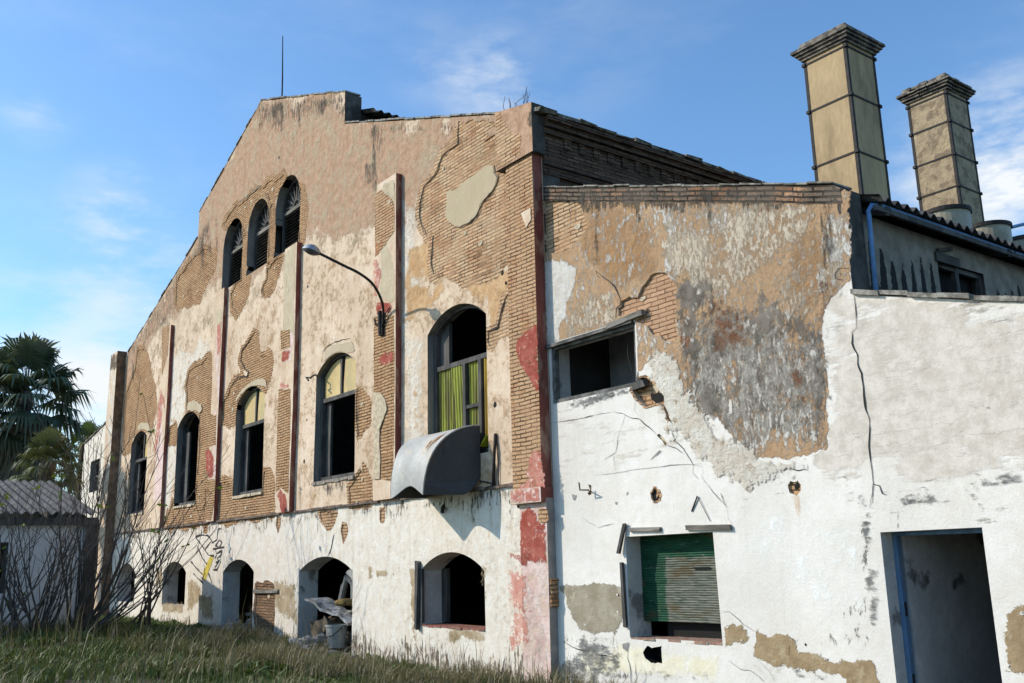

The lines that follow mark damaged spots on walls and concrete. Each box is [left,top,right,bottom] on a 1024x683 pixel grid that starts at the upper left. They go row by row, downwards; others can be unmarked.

spalling [415,111,521,288]
spalling [174,244,218,312]
peeling [486,189,852,460]
spalling [121,322,291,534]
crack [551,407,728,514]
crack [835,268,898,528]
peeling [549,578,629,652]
peeling [724,623,880,683]
peeling [1004,605,1024,674]